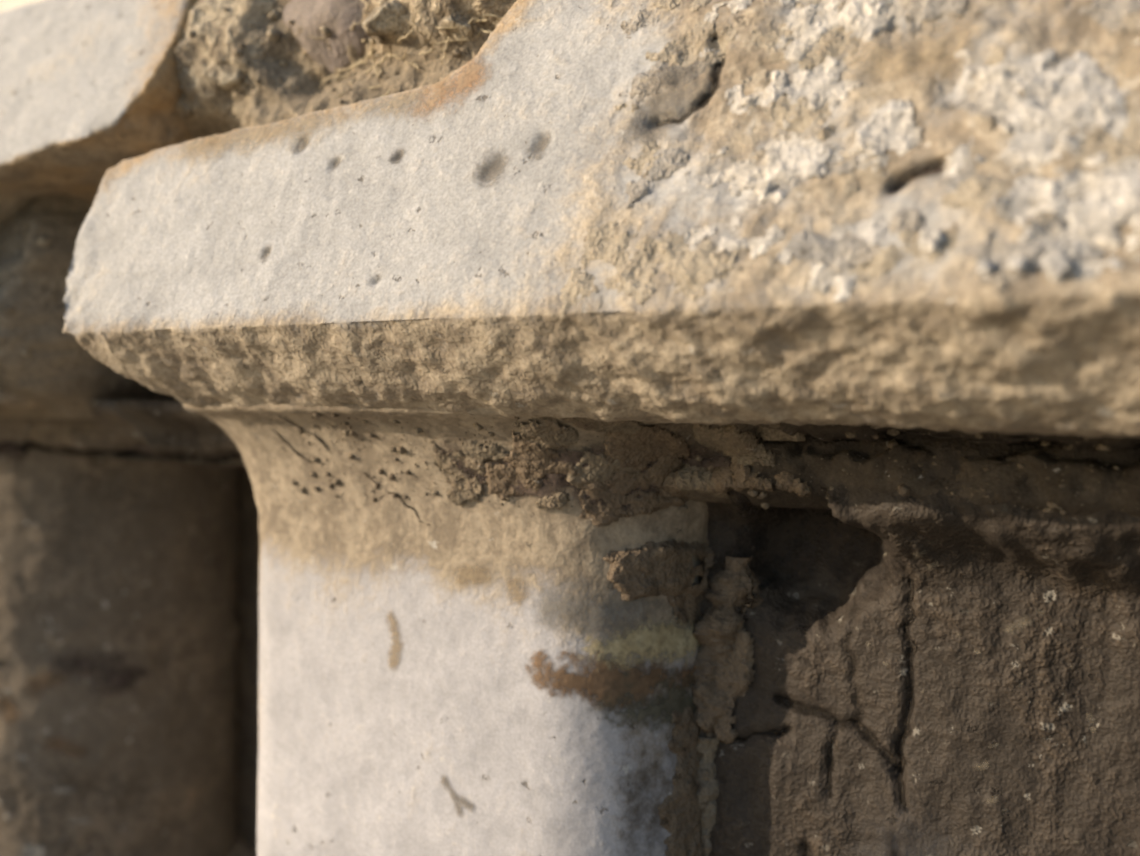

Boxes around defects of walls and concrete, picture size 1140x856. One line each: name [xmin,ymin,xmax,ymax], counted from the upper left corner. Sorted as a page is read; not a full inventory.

peeling [905,0,976,37]
peeling [1079,0,1140,37]
peeling [613,0,879,209]
water stain [684,0,1140,283]
peeling [930,76,1031,132]
peeling [783,105,1140,295]
peeling [556,220,748,321]
water stain [809,262,857,301]
rust [526,622,701,729]
spalling [432,417,901,856]
crack [734,580,917,813]